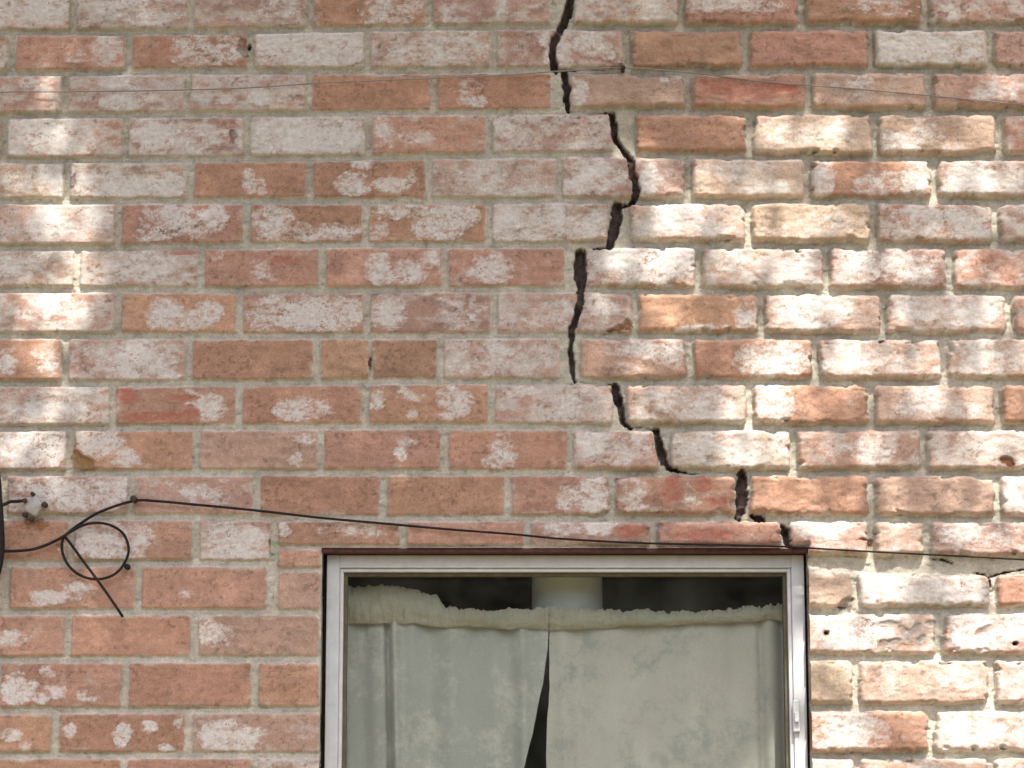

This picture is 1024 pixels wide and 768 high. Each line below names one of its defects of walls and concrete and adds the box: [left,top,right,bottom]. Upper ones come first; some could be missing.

crack [549,0,576,114]
crack [568,112,641,384]
crack [608,383,687,474]
crack [734,469,791,546]